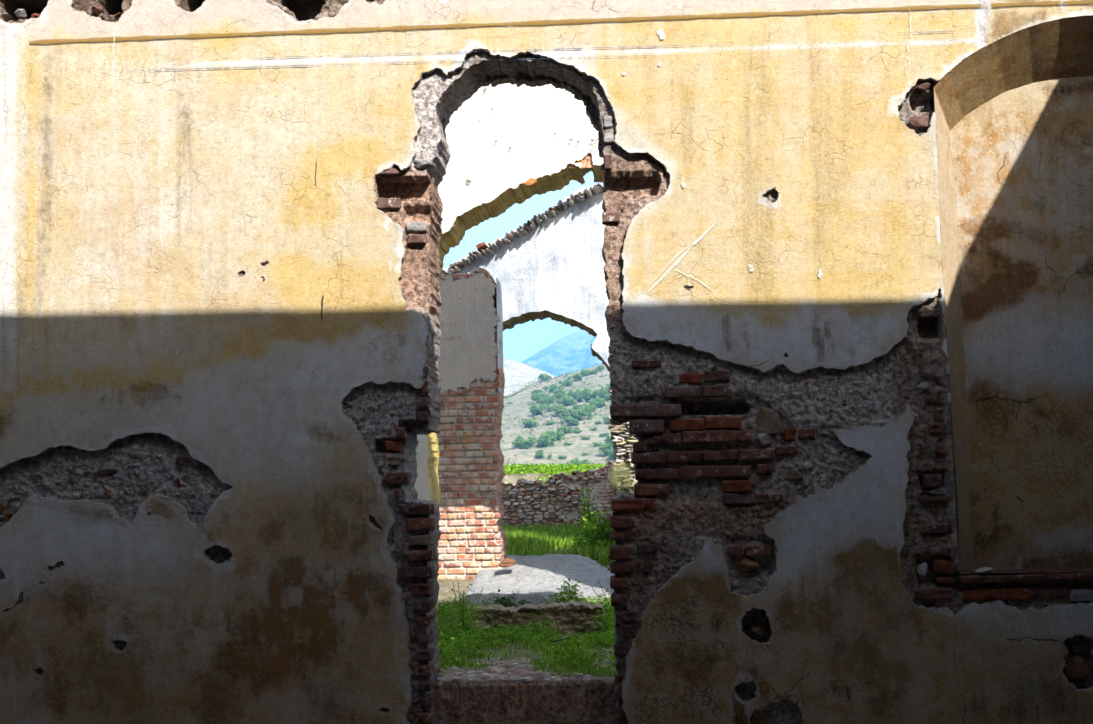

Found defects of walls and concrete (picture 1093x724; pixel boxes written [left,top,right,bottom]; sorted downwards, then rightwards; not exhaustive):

spalling [0,0,49,23]
crack [0,0,132,24]
spalling [73,0,132,22]
spalling [175,0,205,12]
spalling [266,0,349,21]
crack [265,0,378,22]
crack [237,261,269,282]
crack [341,8,1093,724]
spalling [342,50,1093,724]
crack [0,432,233,565]
leakage [196,557,391,724]
leakage [775,539,918,718]